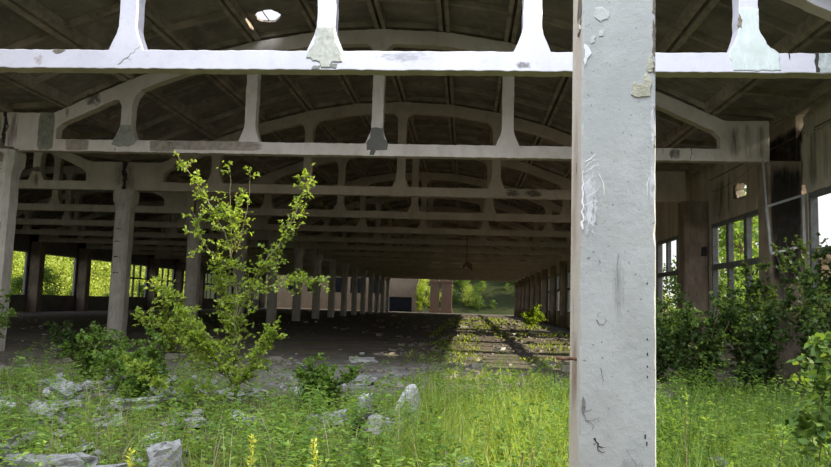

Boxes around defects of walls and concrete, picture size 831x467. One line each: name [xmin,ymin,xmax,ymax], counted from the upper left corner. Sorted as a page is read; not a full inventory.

spalling [306,26,342,69]
peeling [577,0,610,66]
spalling [729,7,781,71]
crack [1,112,9,145]
spalling [366,127,388,155]
crack [572,360,606,453]